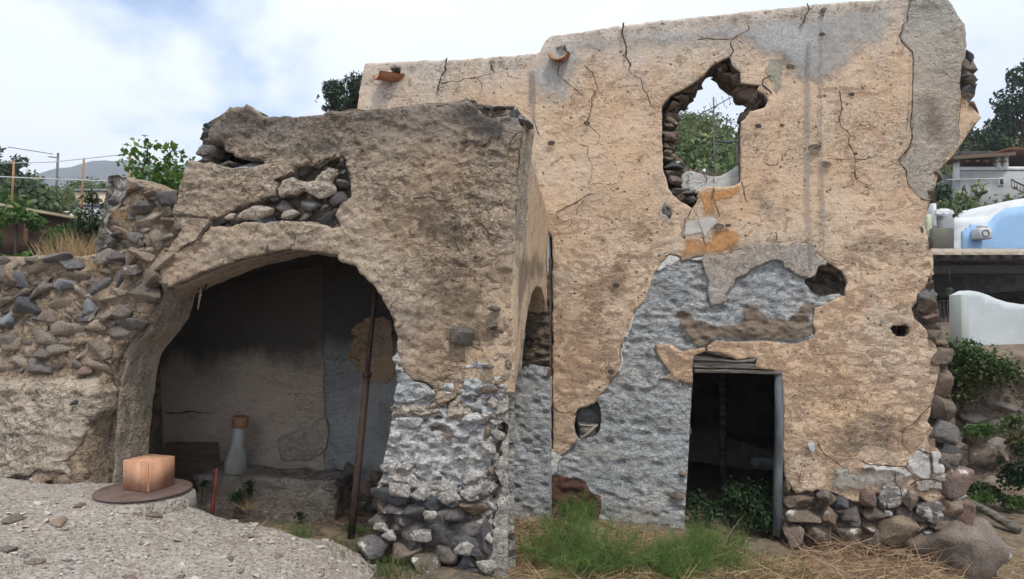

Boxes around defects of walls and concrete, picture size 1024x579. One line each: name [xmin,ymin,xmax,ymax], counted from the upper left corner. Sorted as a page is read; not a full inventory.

spalling [209,156,351,229]
crack [436,58,495,94]
crack [462,62,623,230]
crack [621,23,662,108]
flaking render [663,64,763,166]
crack [827,0,923,200]
spalling [377,352,514,504]
spalling [551,242,842,529]